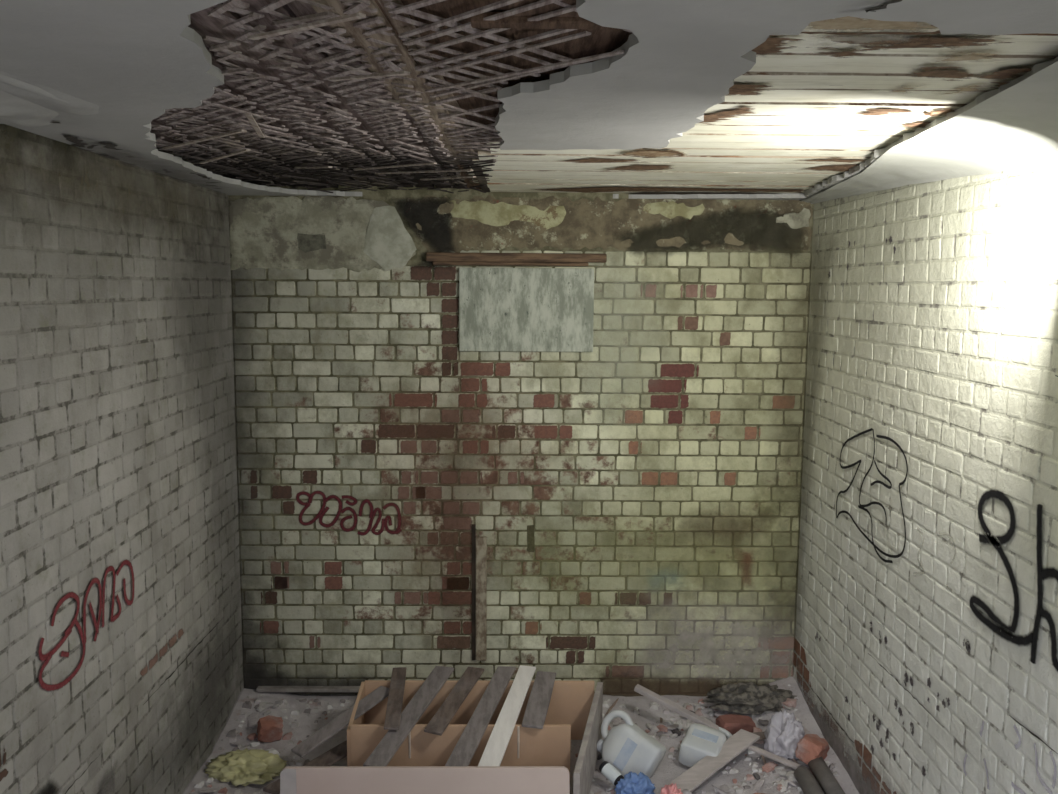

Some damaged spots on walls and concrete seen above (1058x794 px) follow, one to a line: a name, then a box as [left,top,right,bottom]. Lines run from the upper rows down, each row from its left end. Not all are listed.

peeling [751,16,1032,94]
peeling [700,81,772,125]
peeling [854,108,954,133]
damp [0,124,222,228]
peeling [563,149,687,171]
peeling [801,158,863,172]
damp [621,209,802,253]
flaking render [793,638,896,794]